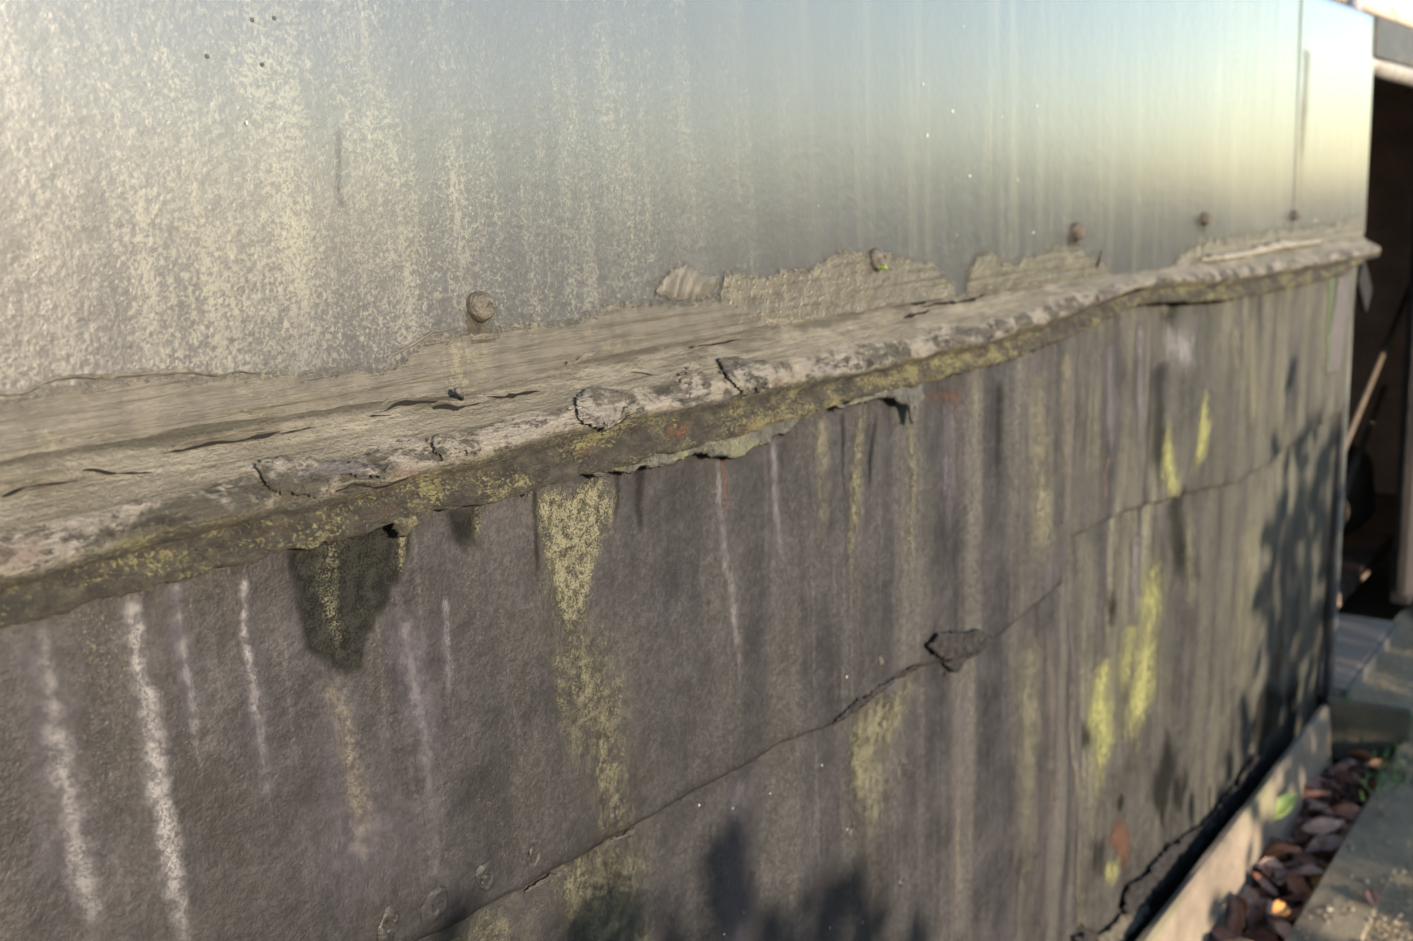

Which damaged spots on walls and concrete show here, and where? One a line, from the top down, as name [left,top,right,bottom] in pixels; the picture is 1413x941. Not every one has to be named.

peeling [1326,276,1351,374]
peeling [568,386,628,431]
peeling [717,356,777,393]
peeling [255,455,386,498]
damp [46,727,90,894]
damp [127,604,183,917]
damp [173,587,190,683]
damp [242,581,264,752]
damp [290,524,411,673]
damp [401,624,426,739]
peeling [1153,739,1187,822]
peeling [1254,685,1299,750]